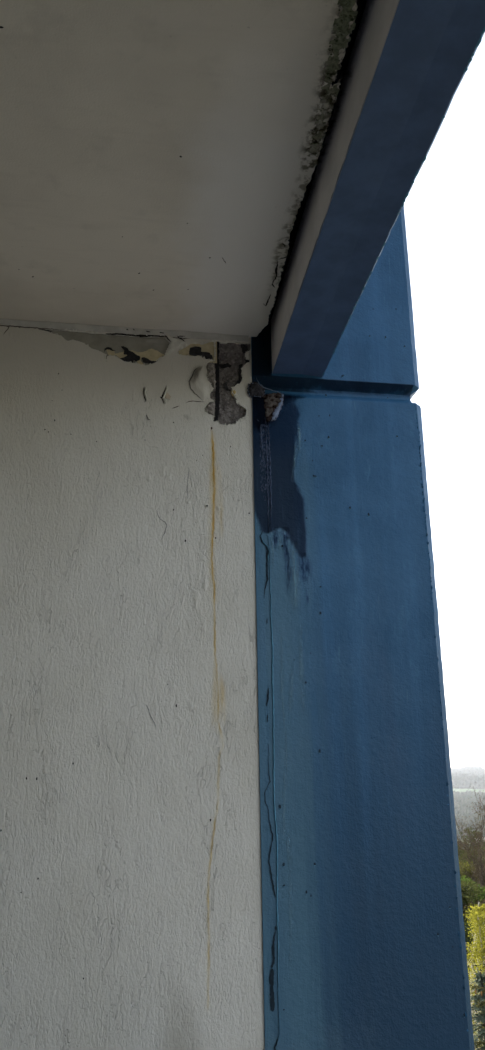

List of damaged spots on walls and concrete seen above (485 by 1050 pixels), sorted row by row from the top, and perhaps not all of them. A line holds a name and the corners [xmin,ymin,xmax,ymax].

spalling [307,0,358,165]
spalling [46,328,284,528]
water stain [252,395,305,599]
crack [264,688,276,898]
crack [269,926,277,1012]